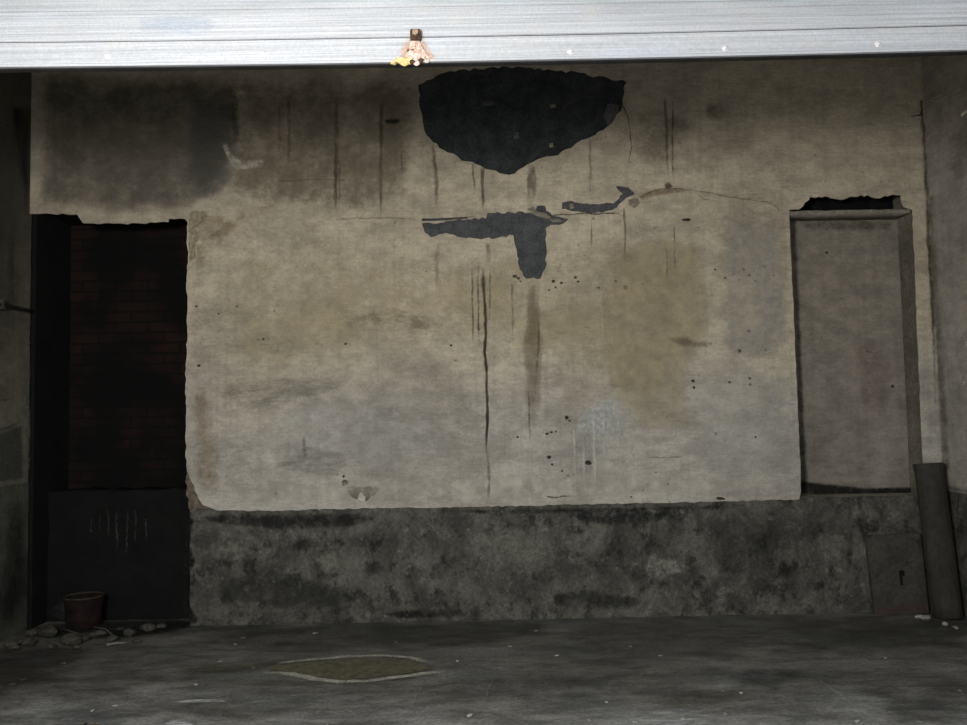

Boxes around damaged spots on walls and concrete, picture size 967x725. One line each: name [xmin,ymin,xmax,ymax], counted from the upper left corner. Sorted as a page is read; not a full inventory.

flaking render [418,66,626,175]
spalling [791,195,893,211]
flaking render [422,186,640,291]
water stain [208,514,372,550]
water stain [537,507,684,524]
water stain [646,555,681,579]